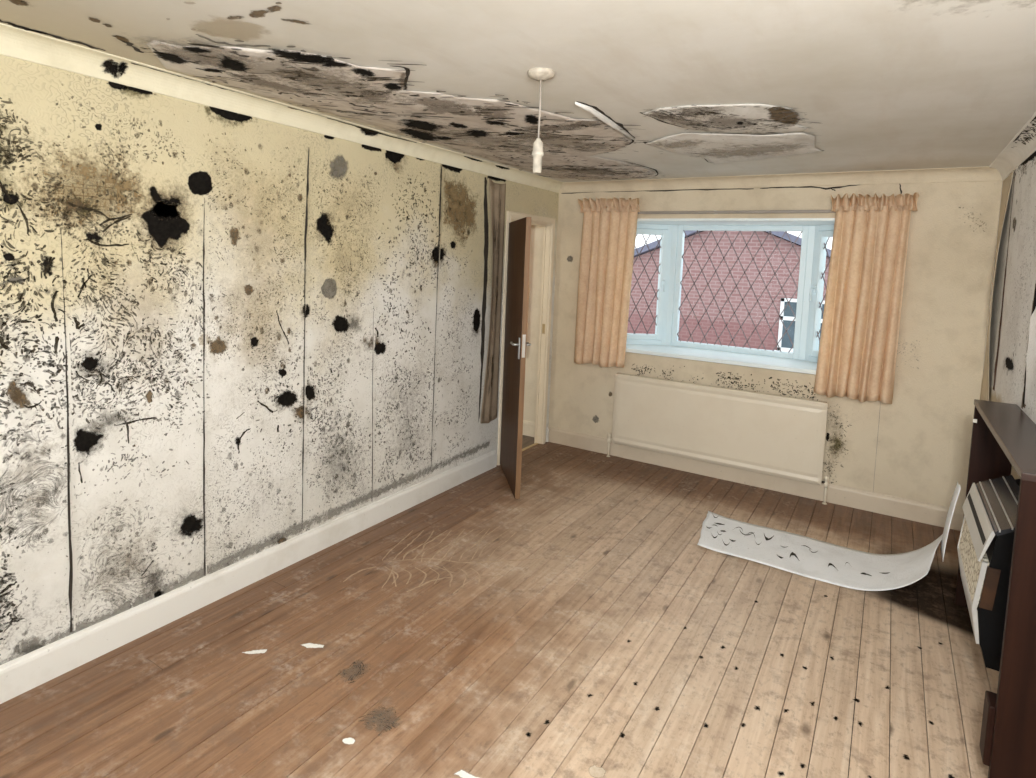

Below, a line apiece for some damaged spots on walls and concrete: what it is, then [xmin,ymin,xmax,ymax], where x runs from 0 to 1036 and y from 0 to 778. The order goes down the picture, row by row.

mould [102,59,153,96]
mould [487,165,509,262]
water stain [0,97,498,502]
water stain [689,372,818,401]
mould [169,515,203,565]
mould [141,560,177,598]